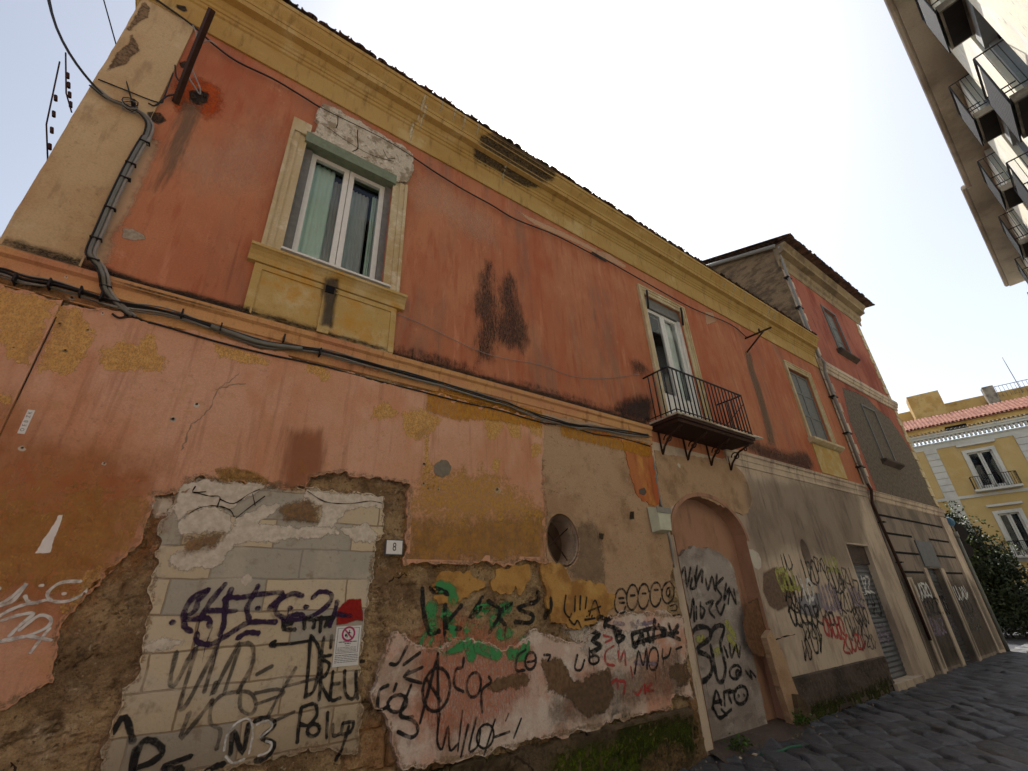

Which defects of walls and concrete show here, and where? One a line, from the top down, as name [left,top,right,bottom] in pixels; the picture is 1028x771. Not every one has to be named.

rust [175,79,222,116]
flaking render [311,104,414,184]
leakage [474,123,555,187]
peeling [0,287,89,366]
peeling [96,334,169,374]
peeling [214,344,271,366]
leakage [5,240,651,428]
peeling [292,357,487,421]
flaking render [0,436,708,771]